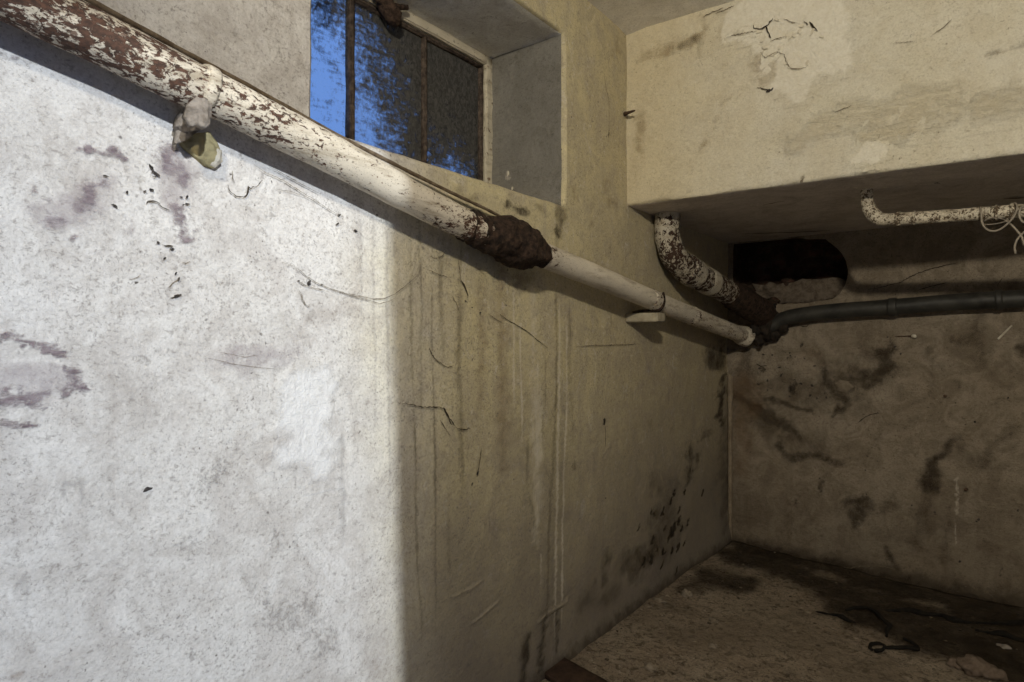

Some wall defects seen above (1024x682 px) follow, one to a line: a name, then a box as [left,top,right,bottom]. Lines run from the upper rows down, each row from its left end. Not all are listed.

leakage [78,145,128,161]
leakage [162,144,189,187]
leakage [73,180,104,212]
leakage [170,203,192,243]
leakage [0,332,89,406]
crack [406,403,470,436]
leakage [921,442,962,549]
leakage [642,468,691,569]